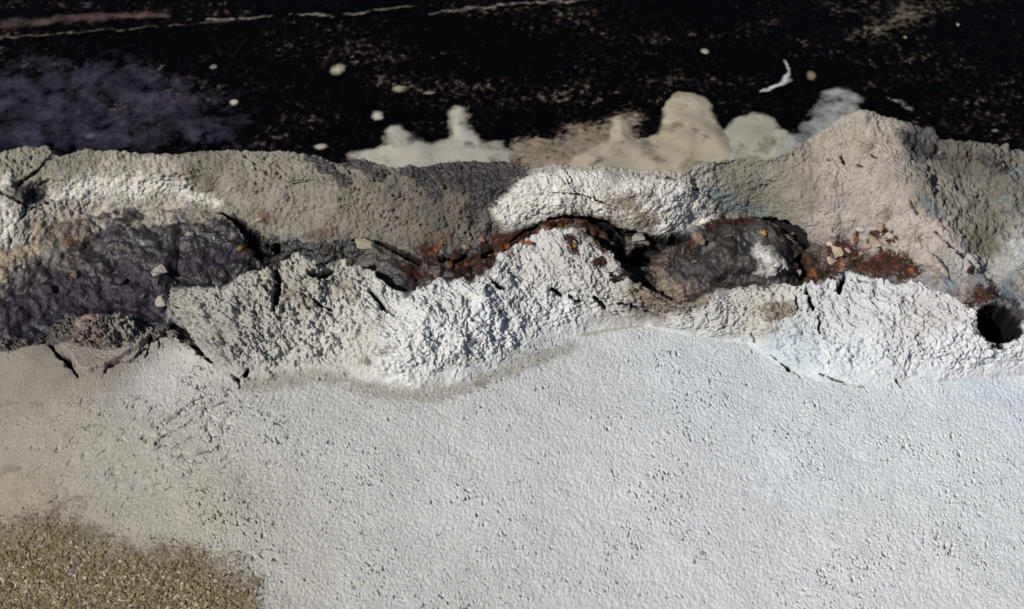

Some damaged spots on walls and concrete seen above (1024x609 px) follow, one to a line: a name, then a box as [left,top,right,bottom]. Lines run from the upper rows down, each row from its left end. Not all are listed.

damp [0,257,168,339]
damp [0,162,225,283]
damp [161,243,245,283]
rust [399,212,610,284]
rust [707,214,754,228]
rust [797,249,824,283]
rust [827,224,925,281]
rust [962,266,1002,317]
crack [51,346,79,378]
crack [105,323,213,374]